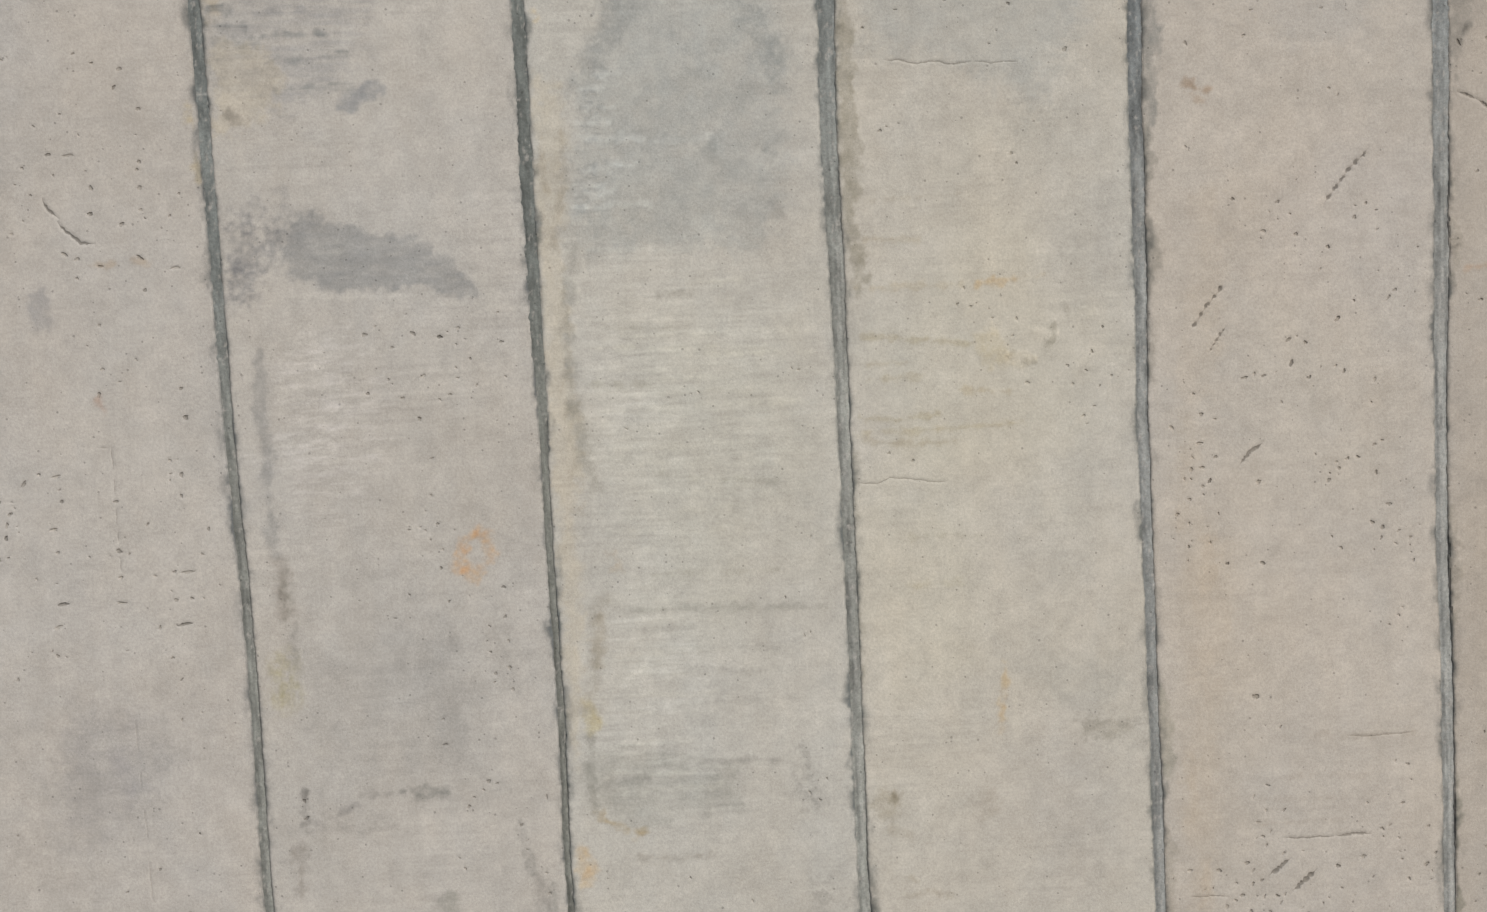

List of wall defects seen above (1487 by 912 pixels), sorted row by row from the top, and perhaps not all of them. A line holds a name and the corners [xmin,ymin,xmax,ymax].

leakage [1191,0,1403,80]
leakage [20,282,62,338]
leakage [201,0,1145,912]